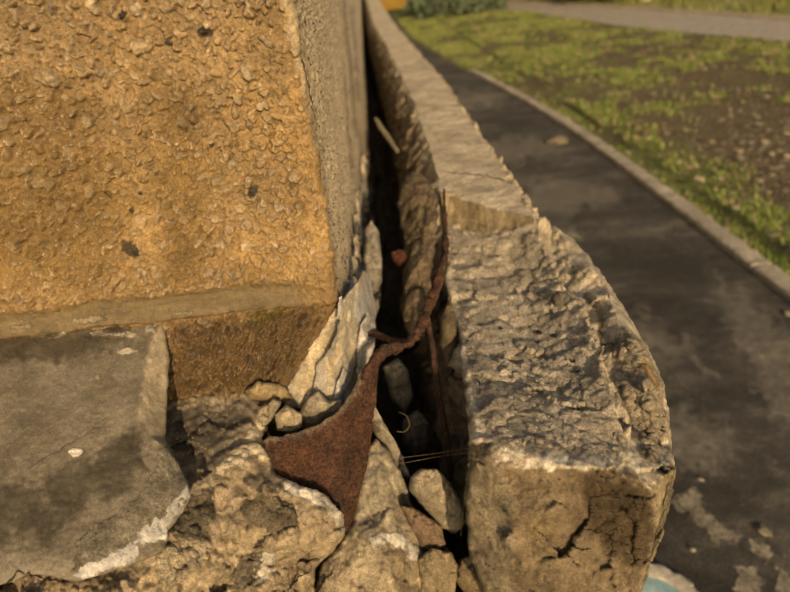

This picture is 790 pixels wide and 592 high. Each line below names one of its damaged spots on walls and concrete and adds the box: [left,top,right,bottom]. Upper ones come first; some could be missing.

crack [300,36,316,120]
crack [444,171,513,184]
peeling [283,191,376,409]
spalling [209,412,271,481]
damp [0,435,143,543]
spalling [266,549,312,588]
crack [283,554,334,592]
crack [571,529,601,551]